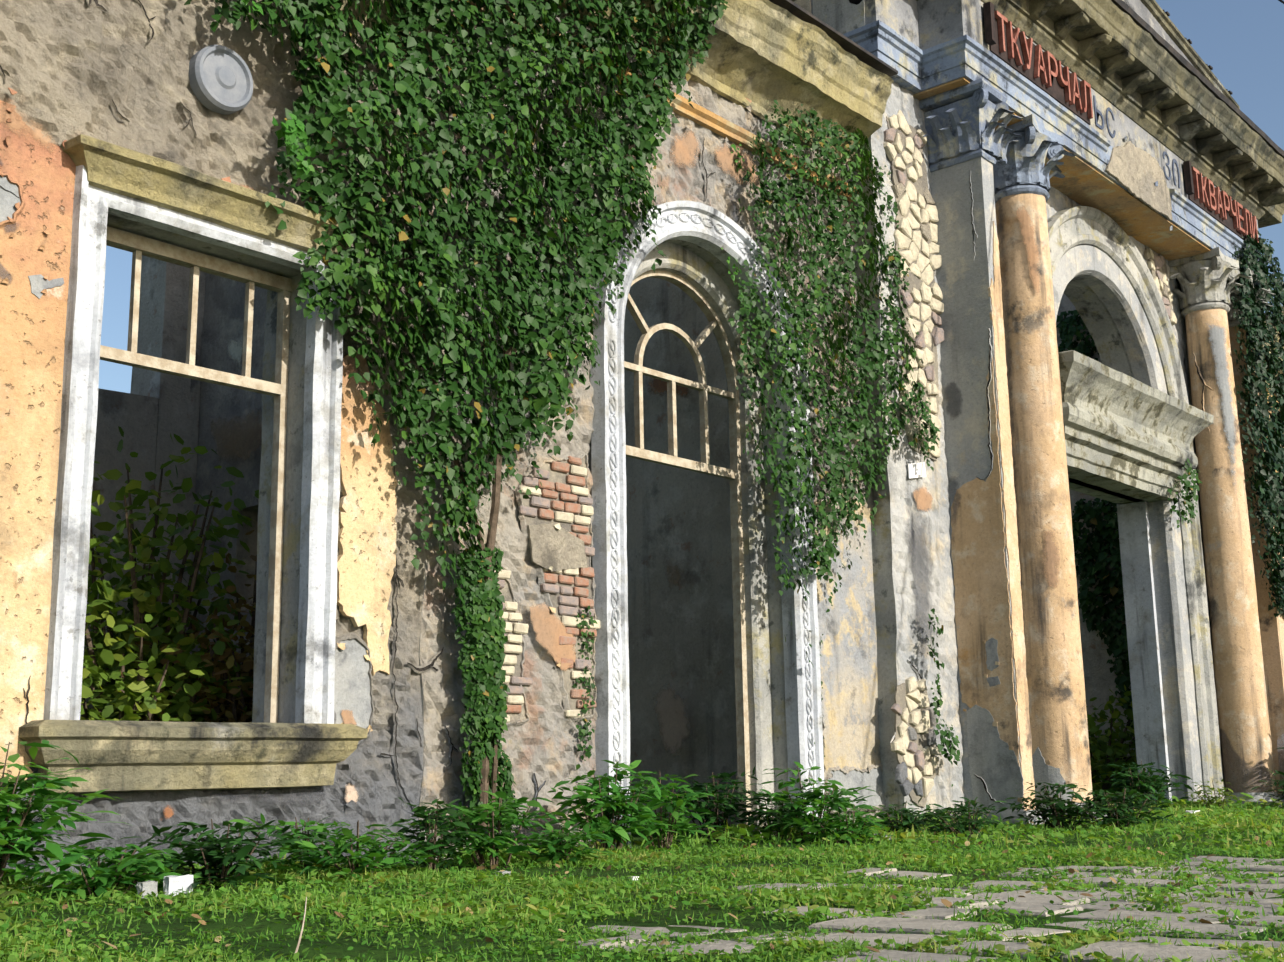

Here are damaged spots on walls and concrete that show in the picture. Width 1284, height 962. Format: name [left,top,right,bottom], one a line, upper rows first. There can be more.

crack [86,0,156,42]
flaking render [0,87,67,237]
flaking render [494,451,601,727]
spalling [334,632,375,749]
flaking render [345,780,358,810]